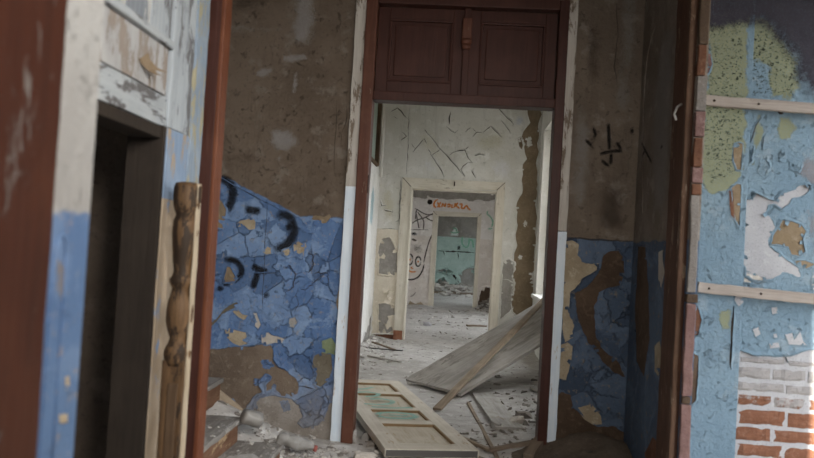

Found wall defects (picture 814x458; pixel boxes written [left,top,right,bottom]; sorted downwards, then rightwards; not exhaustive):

peeling [139,53,167,76]
peeling [706,11,801,101]
peeling [218,198,257,231]
peeling [262,240,308,258]
crack [380,107,514,230]
peeling [435,110,543,322]
peeling [703,106,814,292]
peeling [208,301,337,440]
peeling [556,239,665,441]
peeling [695,305,704,337]
flaking render [735,331,814,458]